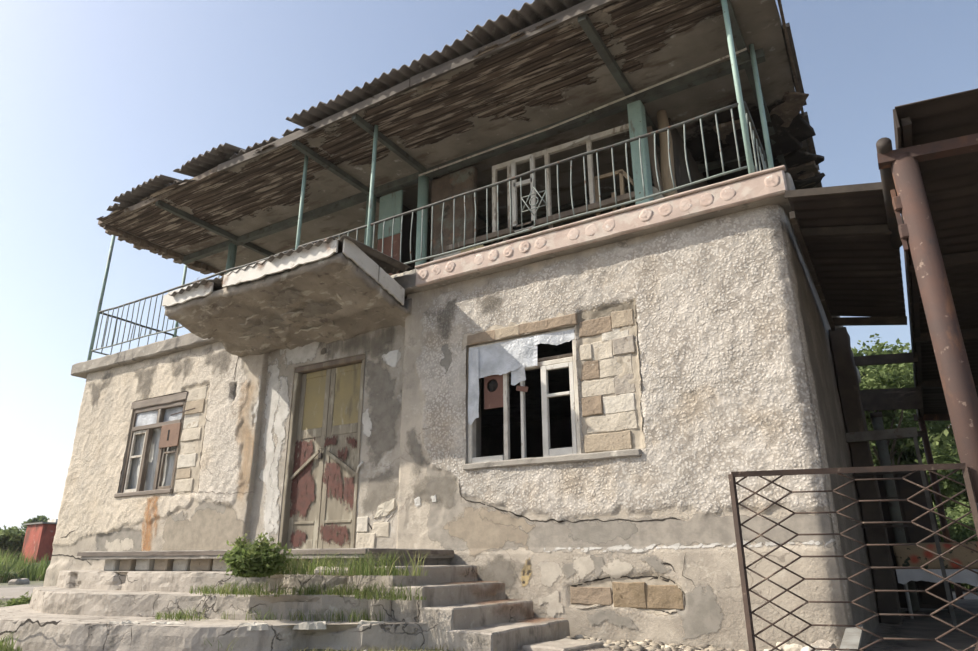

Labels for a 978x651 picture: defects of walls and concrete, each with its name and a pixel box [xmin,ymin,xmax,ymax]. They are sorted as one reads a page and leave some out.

water stain [92,376,106,403]
water stain [137,369,153,399]
peeling [251,342,327,541]
crack [459,483,684,523]
crack [52,530,99,565]
corrosion [142,497,158,551]
peeling [414,463,836,619]
crack [0,617,60,639]